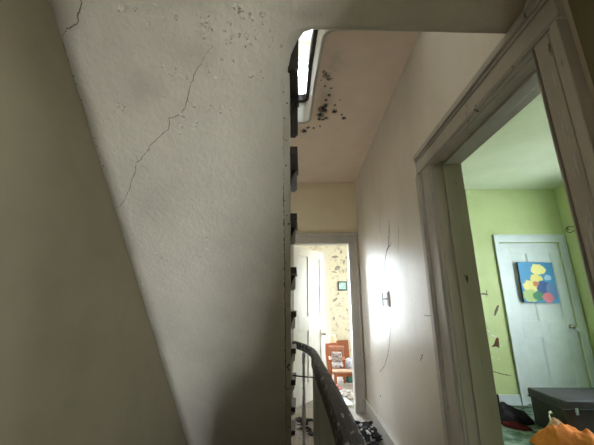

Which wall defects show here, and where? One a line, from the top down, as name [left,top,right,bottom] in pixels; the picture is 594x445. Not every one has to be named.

crack [62,0,82,49]
crack [114,45,213,209]
water stain [302,70,346,133]